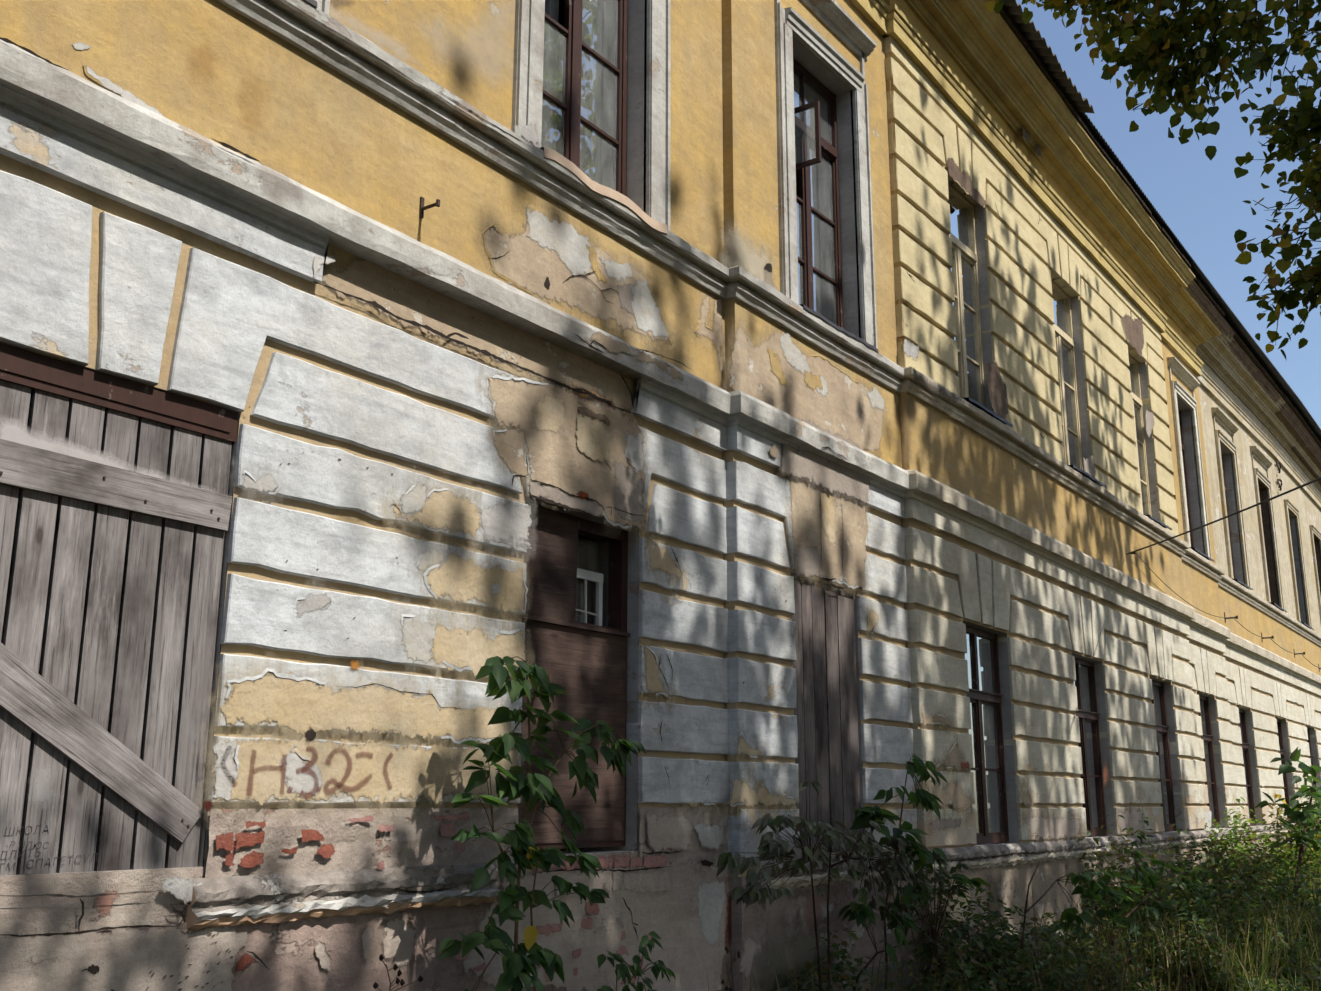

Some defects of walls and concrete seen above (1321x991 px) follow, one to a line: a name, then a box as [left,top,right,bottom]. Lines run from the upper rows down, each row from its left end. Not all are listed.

spalling [313,205,687,590]
crack [313,281,692,416]
crack [565,271,617,304]
spalling [694,292,885,452]
spalling [769,444,870,589]
peeling [401,549,528,678]
peeling [212,668,519,868]
peeling [730,778,796,807]
peeling [0,920,254,991]
spalling [455,813,728,991]
peeling [740,937,761,978]